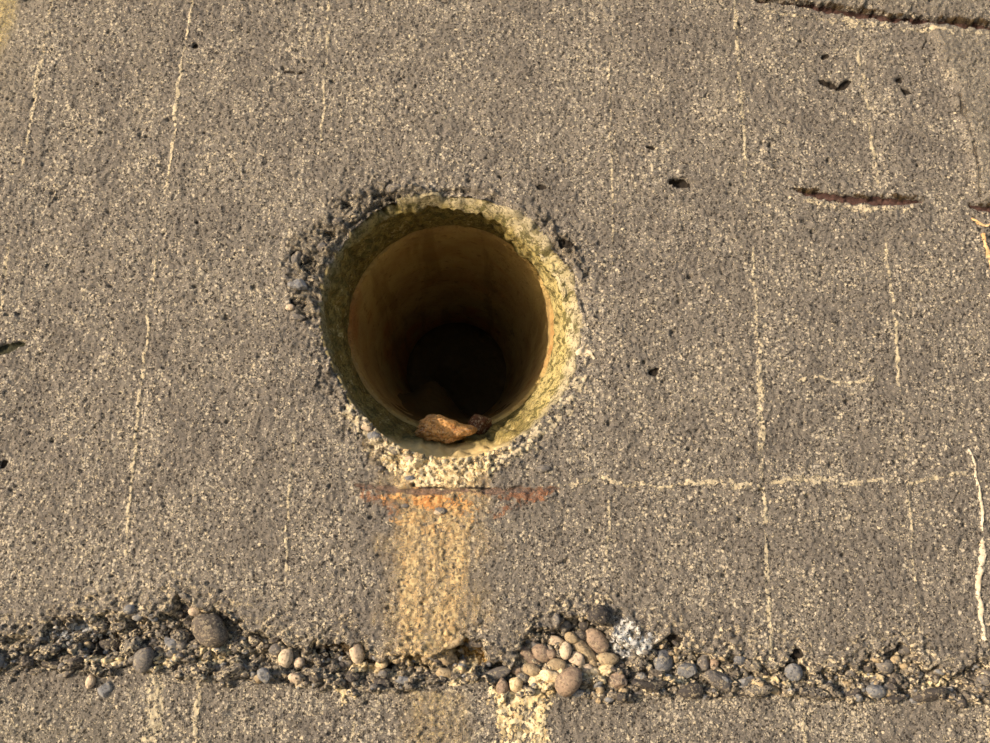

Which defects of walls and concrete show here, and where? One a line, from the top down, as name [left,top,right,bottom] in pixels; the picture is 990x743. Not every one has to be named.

corrosion [380,440,512,665]
crack [362,659,436,672]
leakage [487,681,556,743]